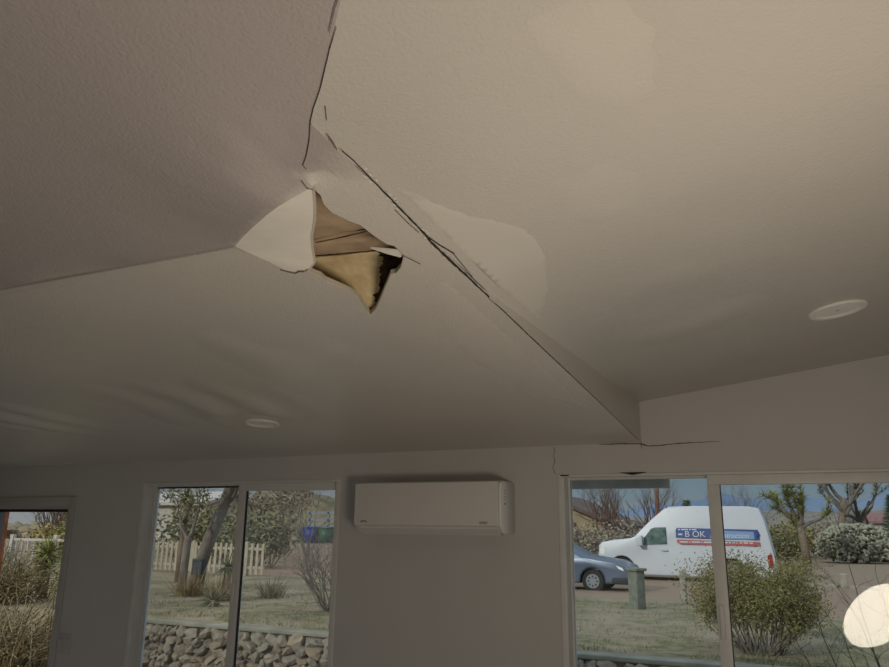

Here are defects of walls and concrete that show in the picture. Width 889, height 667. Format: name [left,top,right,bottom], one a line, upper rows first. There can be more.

crack [301,0,720,447]